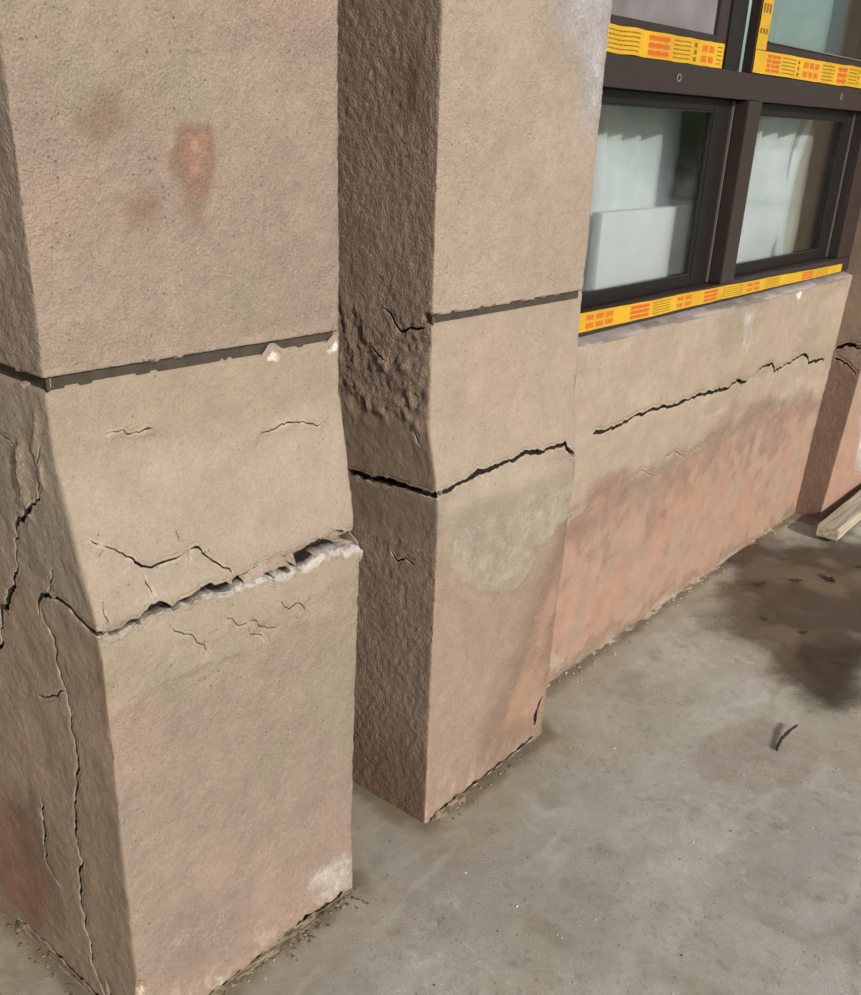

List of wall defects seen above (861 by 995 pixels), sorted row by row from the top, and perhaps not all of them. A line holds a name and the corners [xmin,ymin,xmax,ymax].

crack [369,306,427,364]
crack [105,423,158,439]
crack [256,416,326,441]
crack [348,340,861,502]
flaking render [95,540,363,644]
crack [390,550,416,568]
damp [485,395,861,750]
crack [0,430,358,995]